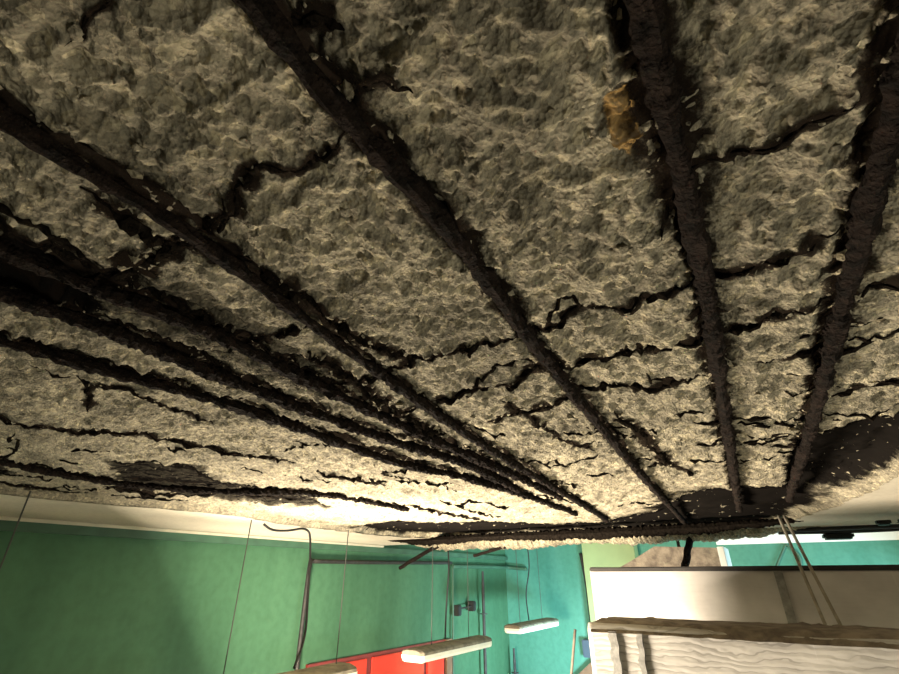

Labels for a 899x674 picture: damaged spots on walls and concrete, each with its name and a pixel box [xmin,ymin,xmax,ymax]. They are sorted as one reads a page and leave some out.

spalling [0,0,899,538]
spalling [388,515,783,570]